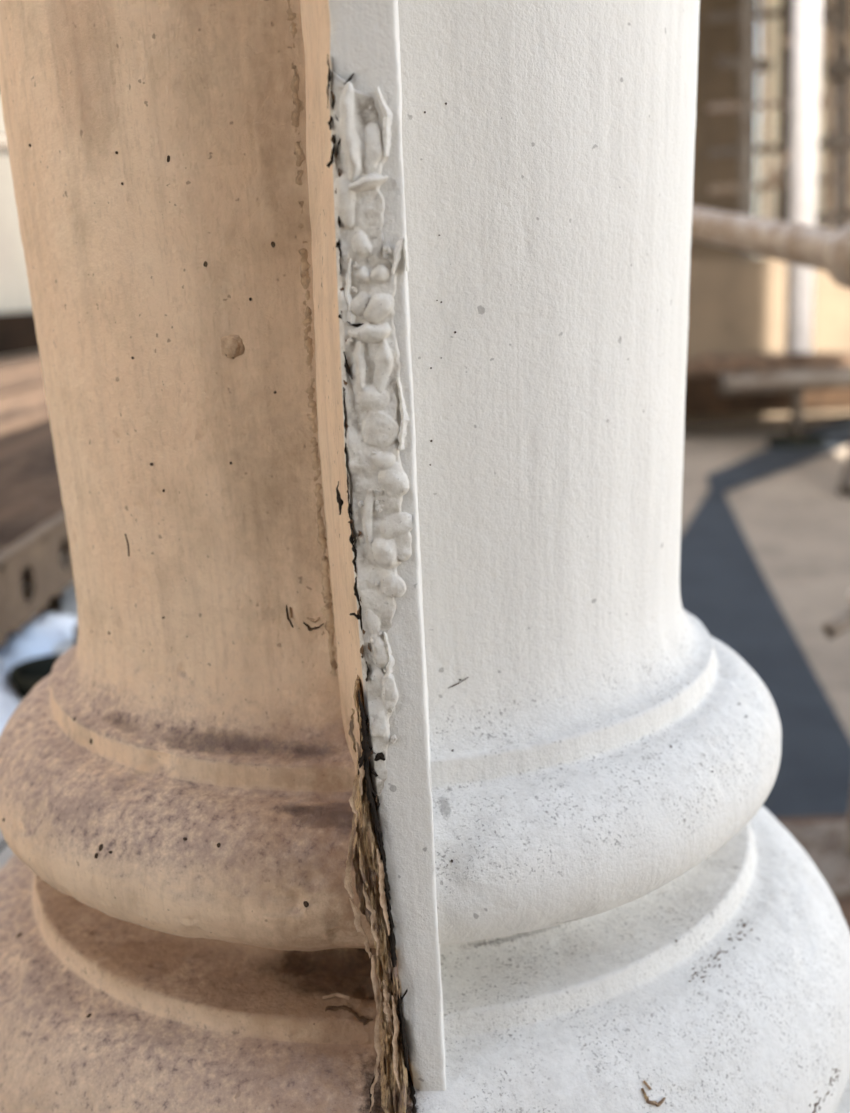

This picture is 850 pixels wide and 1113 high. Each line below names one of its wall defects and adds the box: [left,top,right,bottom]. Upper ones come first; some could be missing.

spalling [322,70,412,1113]
crack [326,54,417,1113]